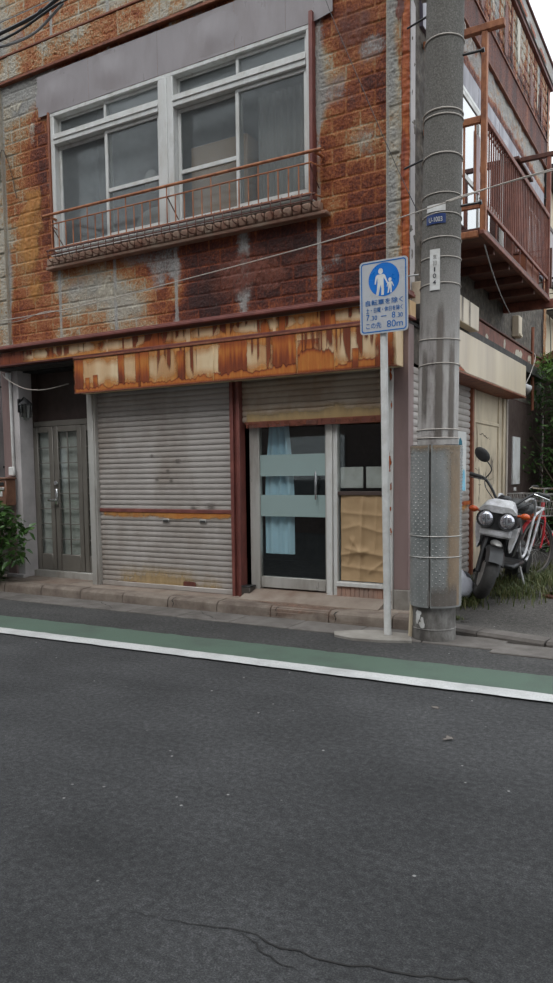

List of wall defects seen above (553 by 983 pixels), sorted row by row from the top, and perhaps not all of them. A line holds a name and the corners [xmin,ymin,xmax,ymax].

rust [0,306,394,393]